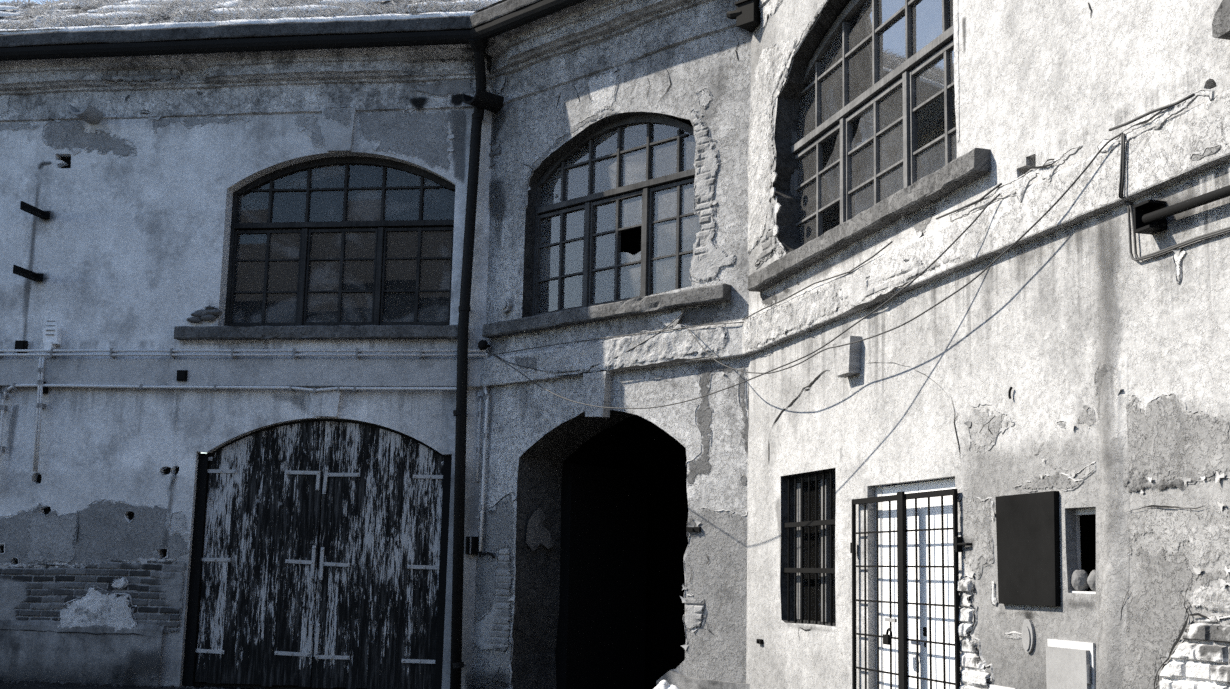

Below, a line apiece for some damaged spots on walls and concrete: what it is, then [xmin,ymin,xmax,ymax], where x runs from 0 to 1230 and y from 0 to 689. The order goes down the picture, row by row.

flaking render [0,95,137,168]
flaking render [689,0,829,283]
flaking render [949,89,1215,222]
flaking render [1173,248,1187,285]
flaking render [515,254,964,486]
crack [748,370,826,462]
flaking render [964,400,1015,453]
flaking render [1115,387,1230,494]
flaking render [0,498,191,634]
flaking render [468,490,554,689]
flaking render [678,507,748,684]
flaking render [1127,501,1230,689]